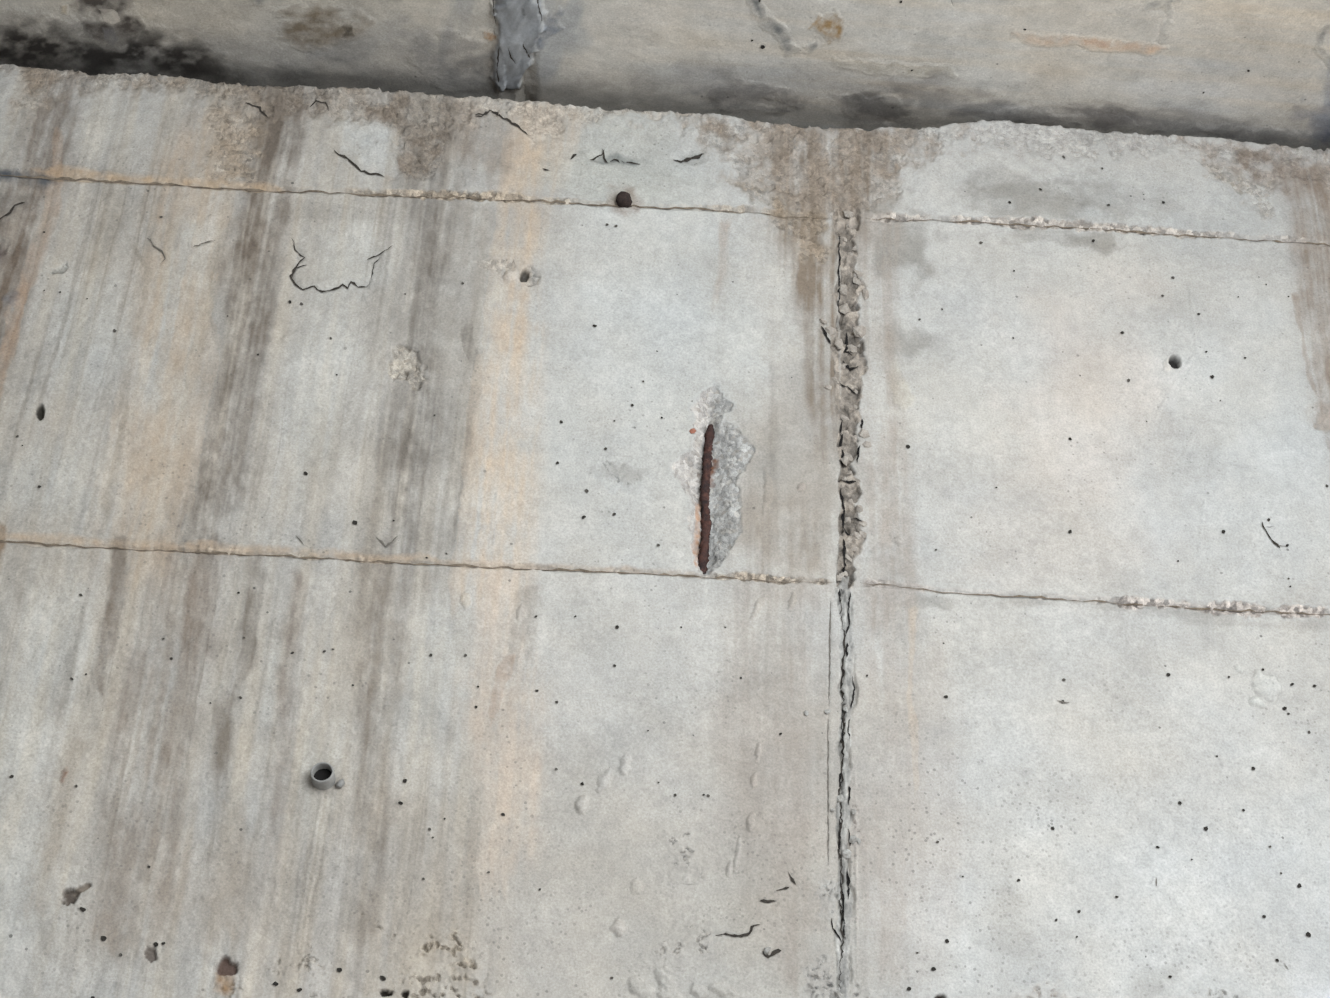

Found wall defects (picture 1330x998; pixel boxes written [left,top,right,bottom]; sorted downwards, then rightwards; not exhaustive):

water stain [0,0,278,95]
crack [475,0,542,134]
crack [334,150,384,177]
rust [602,180,648,221]
crack [675,153,704,164]
crack [290,239,393,292]
water stain [1276,181,1330,402]
rust [697,457,720,488]
spalling [667,382,757,578]
water stain [0,96,940,998]
rust [687,500,702,568]
crack [827,589,846,989]